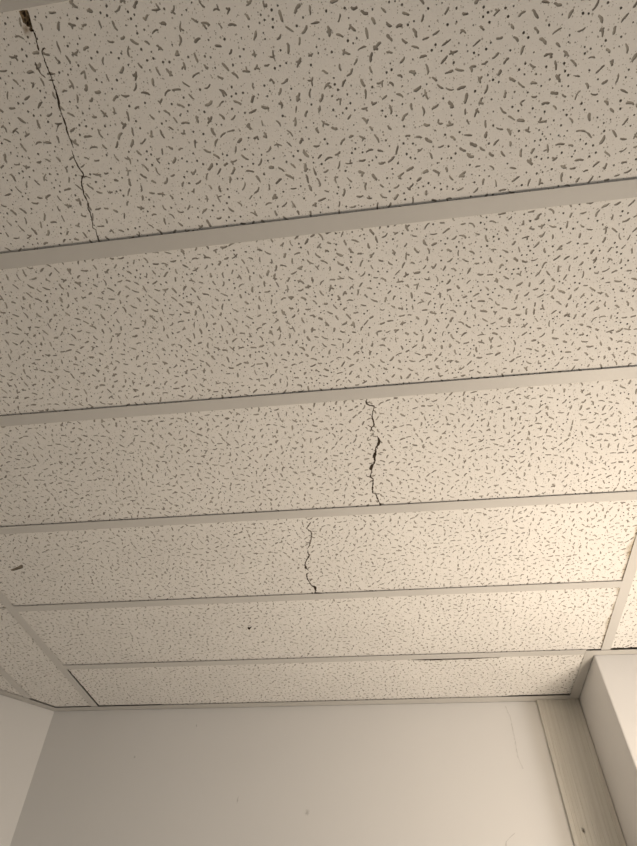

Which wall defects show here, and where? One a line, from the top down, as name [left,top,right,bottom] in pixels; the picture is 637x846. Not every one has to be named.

crack [33,31,99,241]
crack [365,400,383,505]
crack [304,518,321,594]